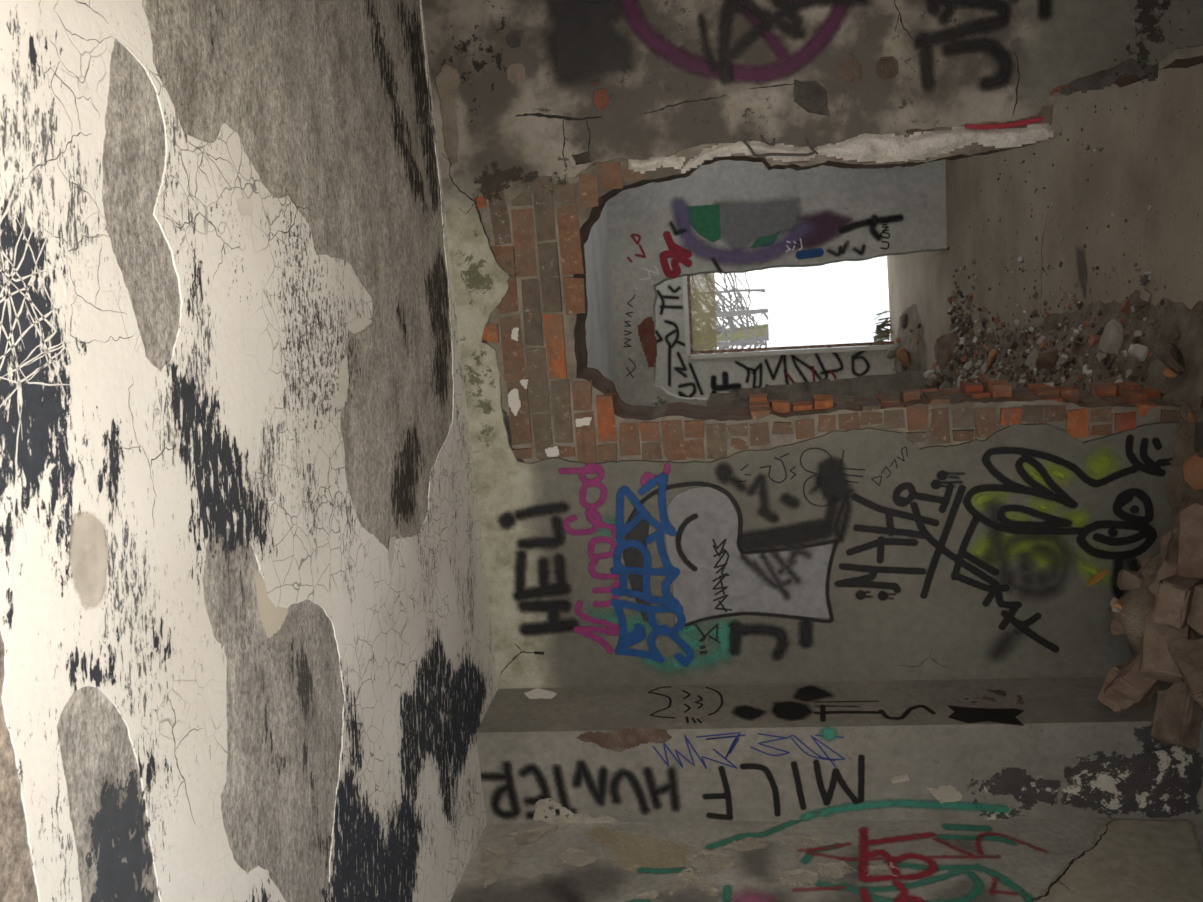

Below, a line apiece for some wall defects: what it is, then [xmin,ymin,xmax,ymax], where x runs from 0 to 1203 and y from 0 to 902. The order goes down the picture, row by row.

crack [22,0,133,343]
crack [163,142,241,275]
peeling [102,0,460,573]
crack [271,189,313,266]
flaking render [474,59,1203,464]
crack [108,378,176,520]
crack [312,454,333,529]
peeling [57,686,170,902]
crack [167,694,203,823]
peeling [202,528,344,902]
spalling [927,722,1203,819]
crack [1031,822,1110,901]